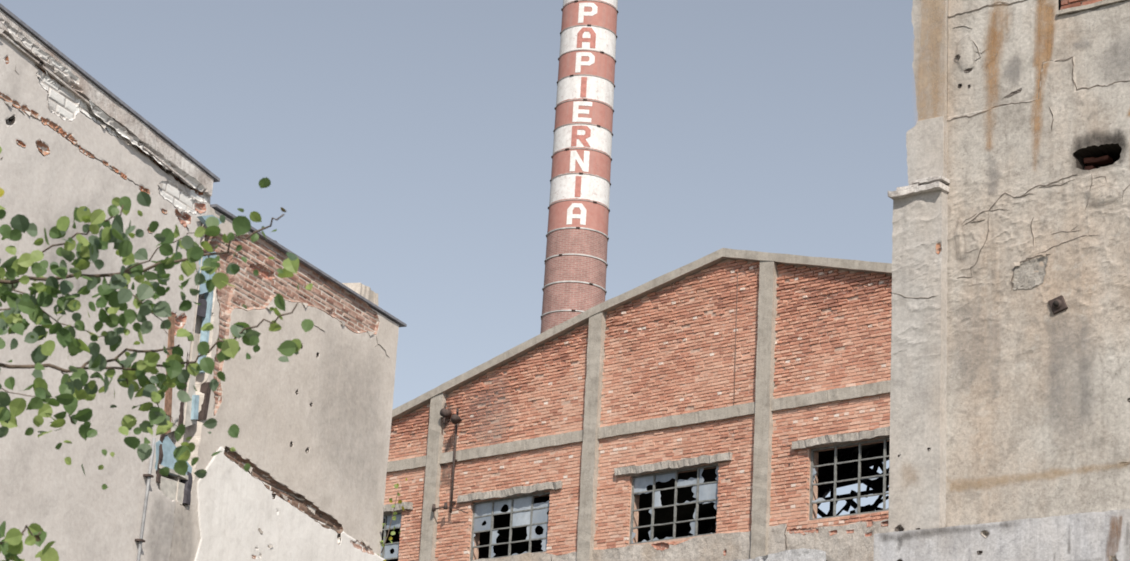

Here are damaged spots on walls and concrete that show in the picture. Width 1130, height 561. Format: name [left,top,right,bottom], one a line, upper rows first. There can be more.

crack [0,97,148,192]
flaking render [0,17,208,229]
crack [947,0,1025,67]
corrosion [987,19,1002,101]
crack [947,89,1054,131]
corrosion [1034,0,1053,144]
crack [1058,0,1127,17]
spalling [1073,143,1122,170]
spalling [1013,253,1048,290]
crack [958,174,1130,289]
spalling [203,234,379,415]
flaking render [194,446,385,561]